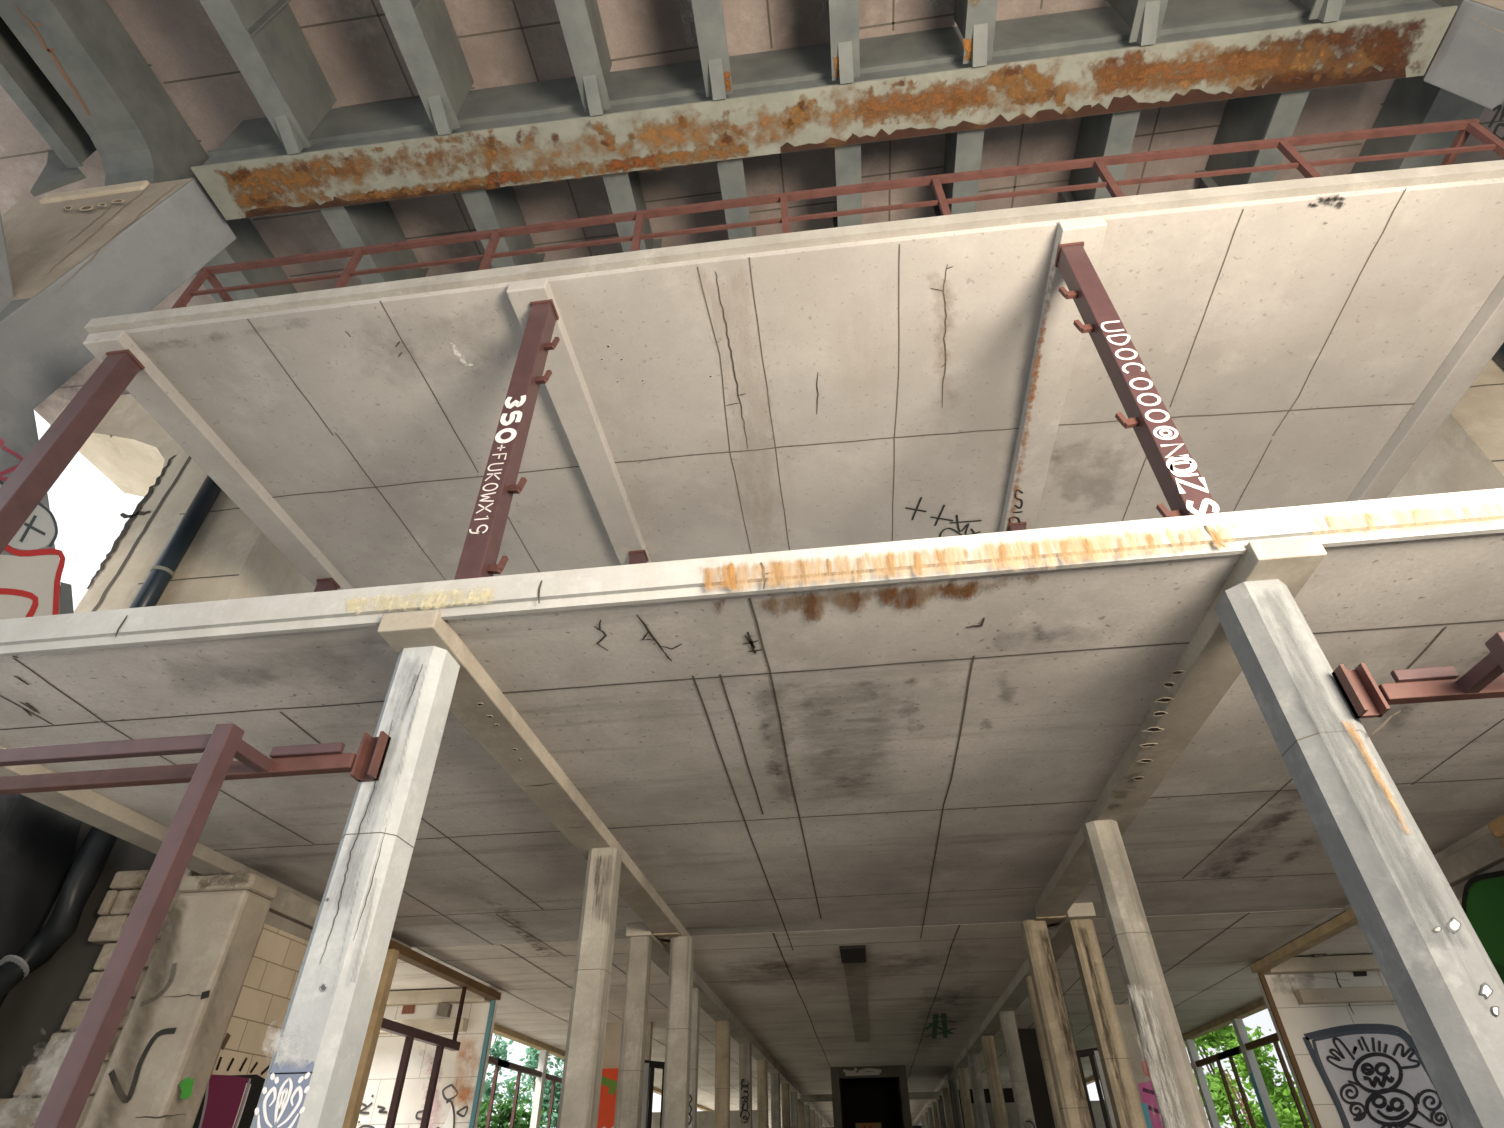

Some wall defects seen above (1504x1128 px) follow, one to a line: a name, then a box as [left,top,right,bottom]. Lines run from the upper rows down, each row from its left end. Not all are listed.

rust [219,19,1425,218]
crack [931,264,953,408]
rust [1022,268,1054,446]
crack [594,615,682,661]
rust [706,526,1233,620]